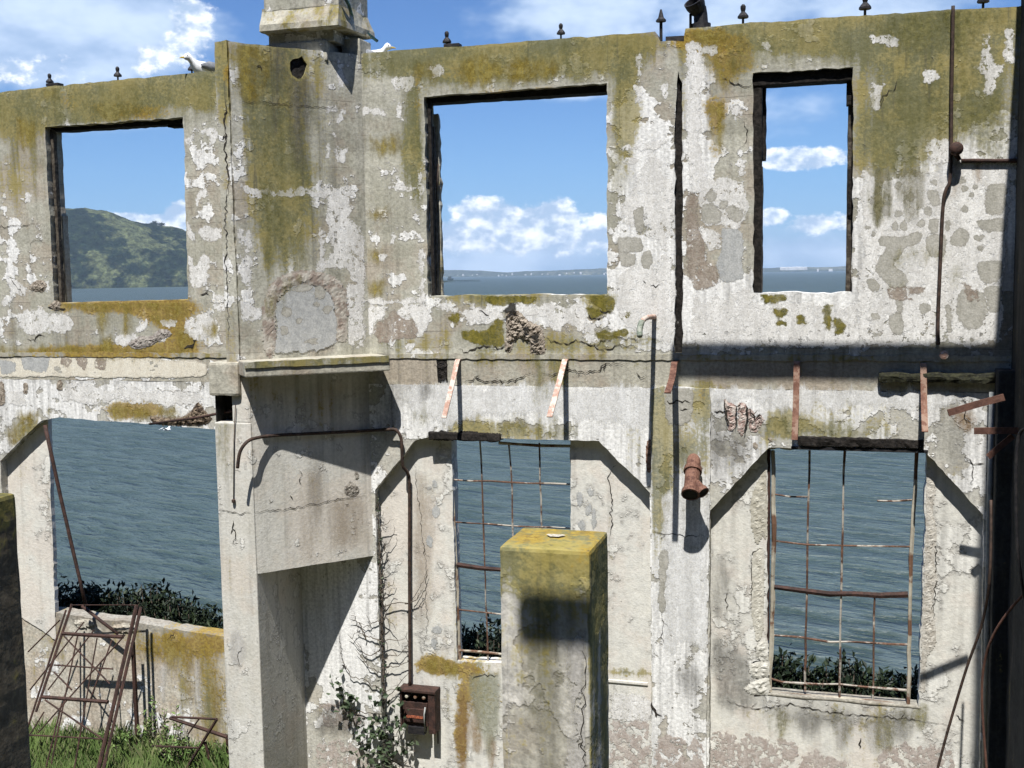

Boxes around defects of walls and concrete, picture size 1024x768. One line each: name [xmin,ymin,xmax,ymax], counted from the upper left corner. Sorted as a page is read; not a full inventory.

peeling [869,35,899,47]
peeling [977,29,1015,95]
peeling [187,221,222,242]
crack [201,101,344,338]
peeling [241,41,1011,355]
leakage [874,170,890,227]
peeling [2,280,74,335]
peeling [188,254,210,290]
peeling [237,228,262,323]
peeling [0,294,225,426]
peeling [710,384,953,450]
spalling [744,469,771,695]